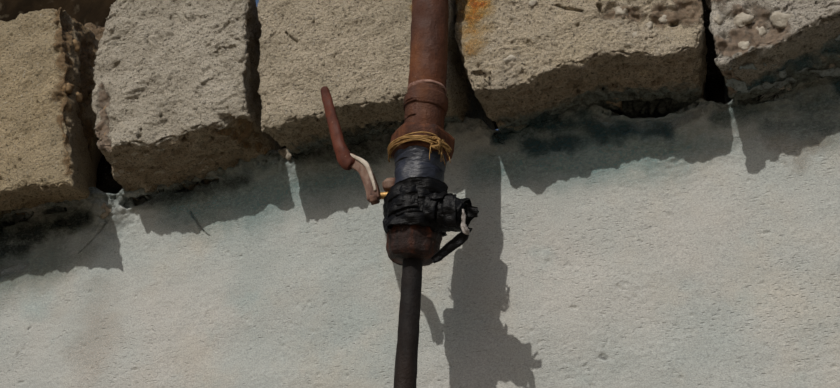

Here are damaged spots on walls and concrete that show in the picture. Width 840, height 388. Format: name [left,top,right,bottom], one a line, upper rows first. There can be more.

damp [343,122,404,161]
damp [477,109,697,177]
damp [711,79,840,136]
damp [0,209,92,277]